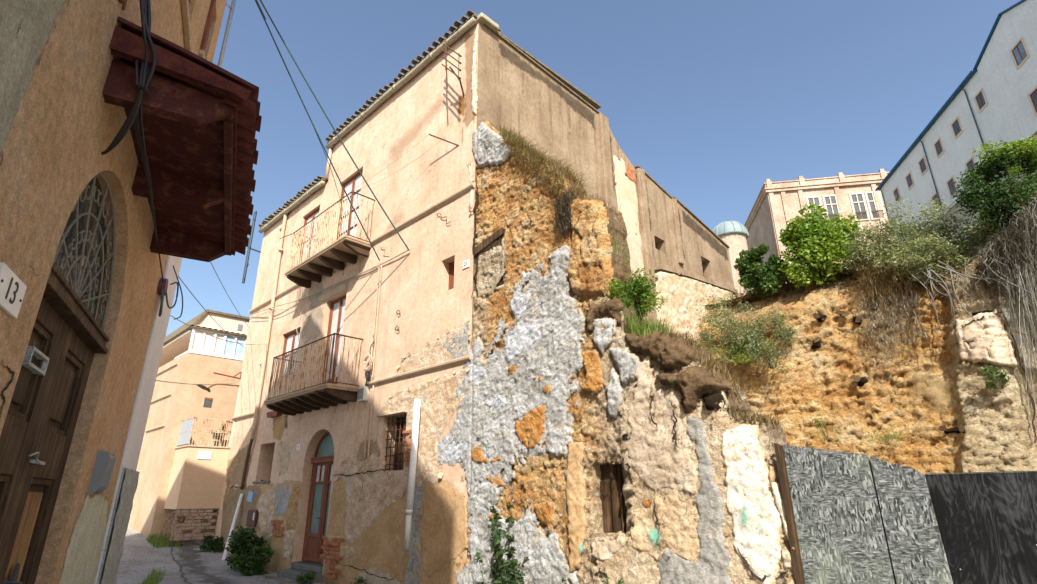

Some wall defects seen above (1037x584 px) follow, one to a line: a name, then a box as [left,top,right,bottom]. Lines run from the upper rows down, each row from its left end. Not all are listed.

flaking render [613,155,735,344]
crack [0,359,16,420]
peeling [320,245,796,584]
crack [649,391,683,450]